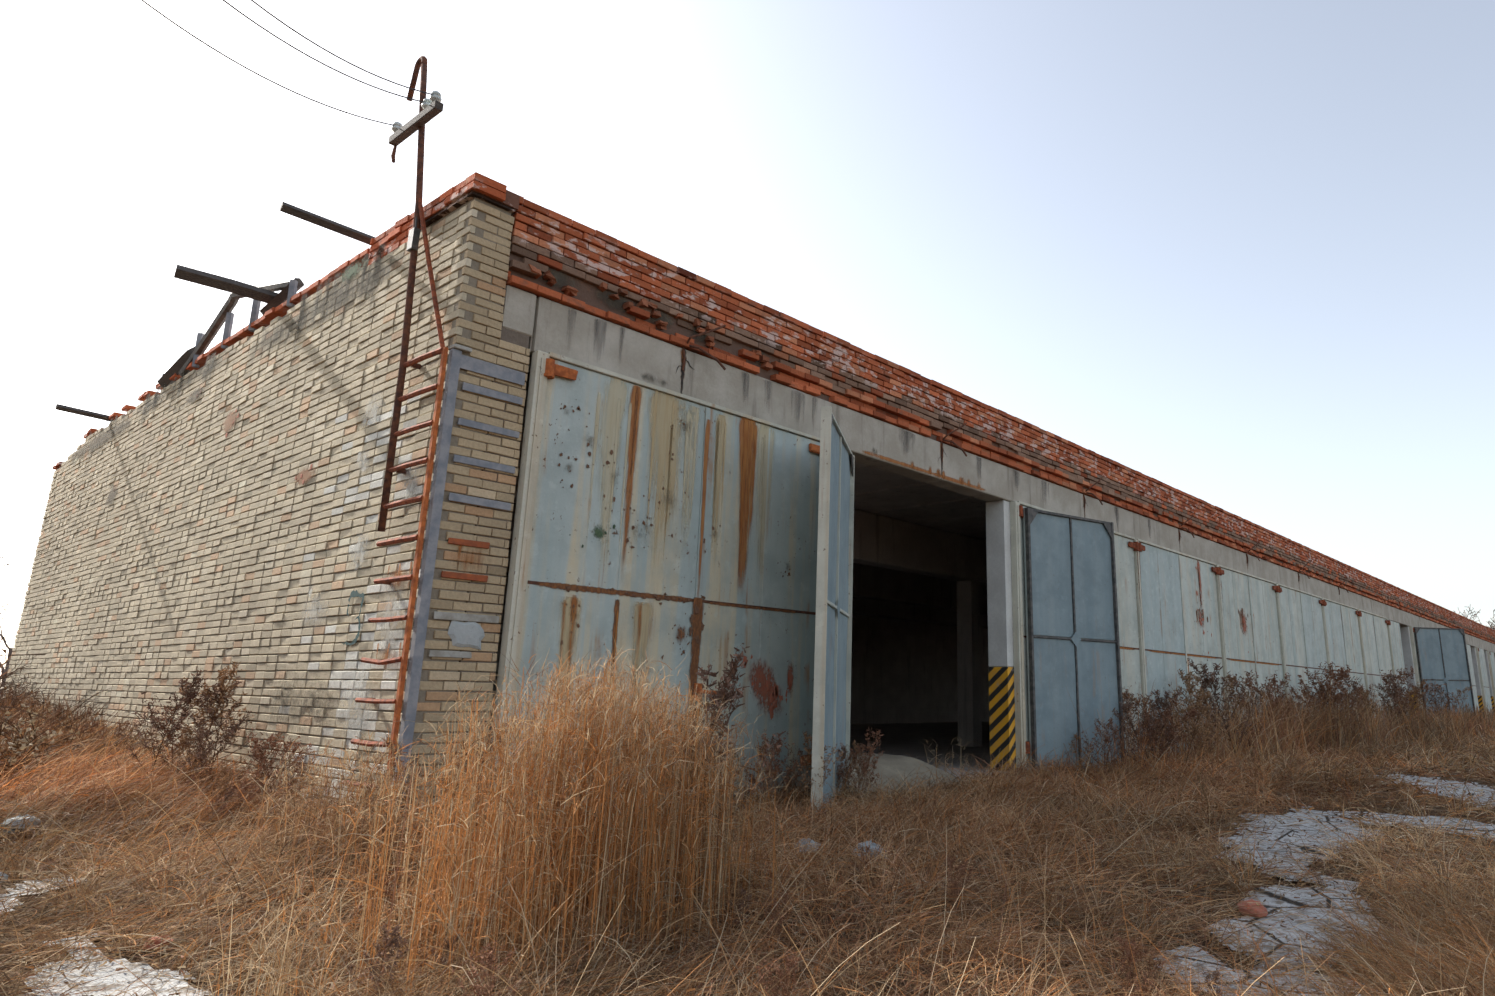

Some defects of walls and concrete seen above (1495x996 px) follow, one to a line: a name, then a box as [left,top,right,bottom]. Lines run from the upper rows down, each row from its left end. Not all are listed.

damp [261,246,391,349]
spalling [528,264,579,296]
rust [623,385,641,558]
rust [738,417,757,584]
rust [539,582,797,701]
rust [1120,561,1279,701]